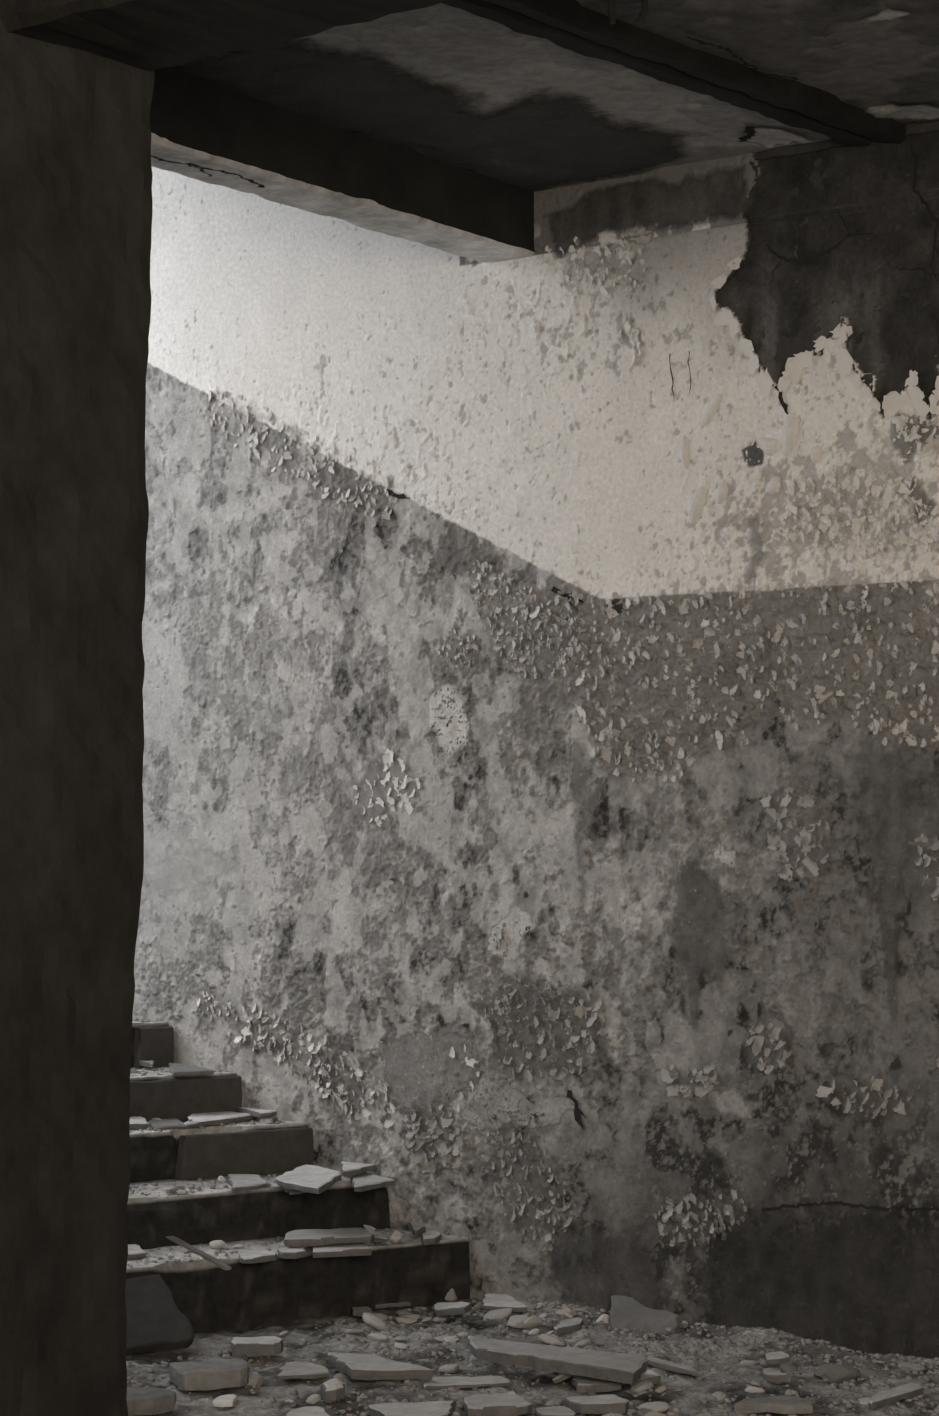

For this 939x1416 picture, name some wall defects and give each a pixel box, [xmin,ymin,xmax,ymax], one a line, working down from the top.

peeling [539,225,653,297]
flaking render [709,105,939,458]
peeling [610,315,641,367]
flaking render [737,435,769,477]
peeling [428,465,939,783]
peeling [353,749,420,827]
flaking render [194,906,607,1252]
peeling [744,1011,792,1075]
peeling [815,1075,912,1119]
peeling [654,1190,747,1247]